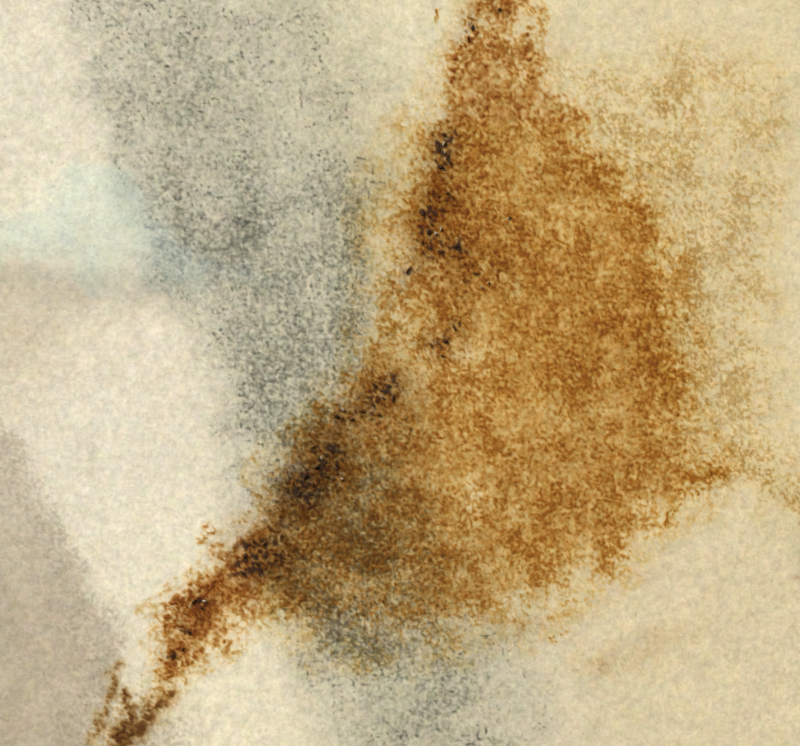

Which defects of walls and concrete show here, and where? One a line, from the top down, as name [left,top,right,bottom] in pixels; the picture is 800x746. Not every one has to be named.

rust [155,0,724,679]